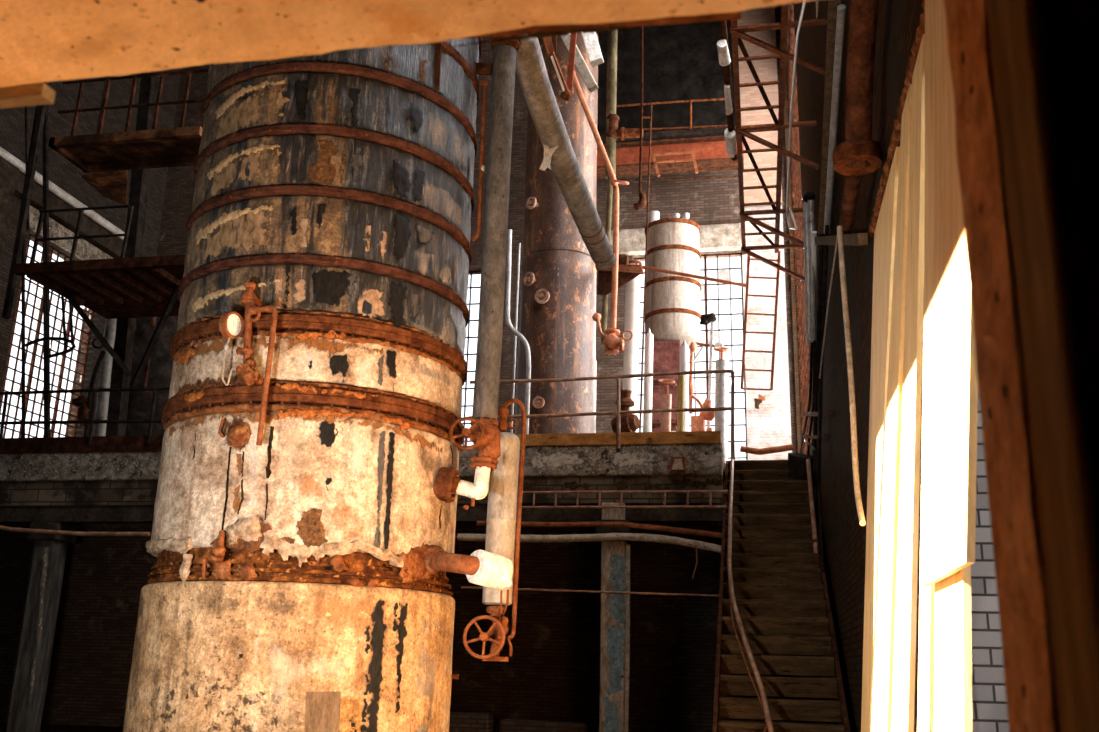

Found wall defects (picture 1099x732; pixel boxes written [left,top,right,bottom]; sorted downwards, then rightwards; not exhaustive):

peeling [214,79,289,140]
peeling [365,225,387,256]
peeling [192,269,385,318]
corrosion [168,375,458,419]
corrosion [163,403,461,553]
peeling [227,516,262,545]
peeling [281,508,328,547]
peeling [213,558,258,581]
peeling [398,542,435,583]
leakage [130,658,299,732]
leakage [350,600,408,732]
leakage [417,623,452,732]